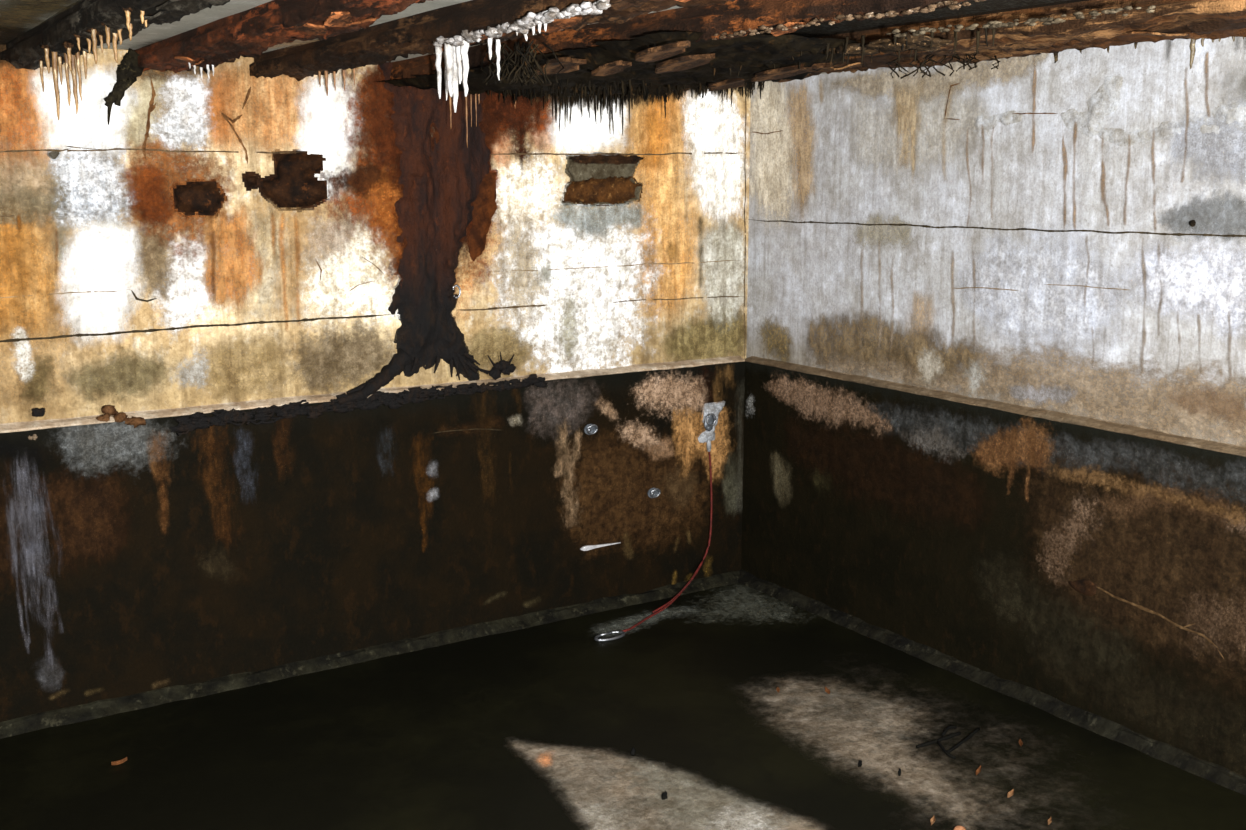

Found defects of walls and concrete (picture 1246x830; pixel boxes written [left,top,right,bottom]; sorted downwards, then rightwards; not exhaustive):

corrosion [0,61,43,156]
spalling [173,179,227,218]
spalling [242,149,330,212]
corrosion [323,62,554,405]
crack [460,304,546,312]
water stain [469,155,659,433]
spalling [560,152,644,207]
corrosion [629,91,697,315]
water stain [665,81,796,362]
crack [490,95,1246,343]
crack [944,83,960,120]
water stain [807,198,1246,447]